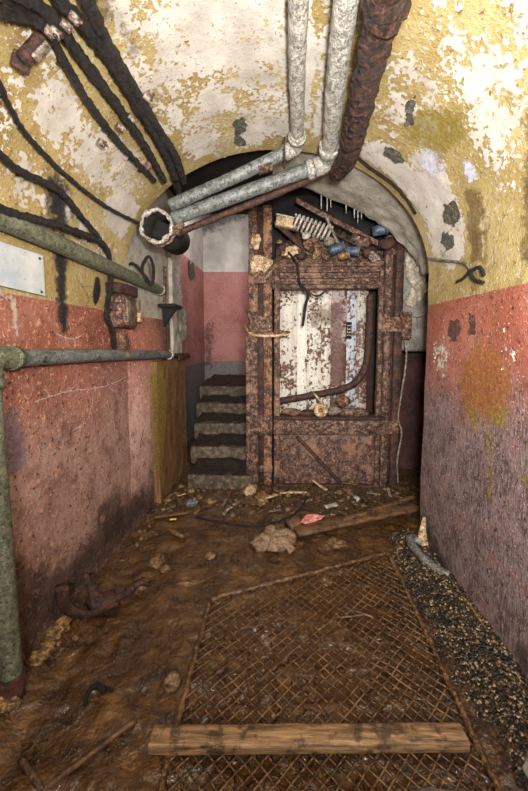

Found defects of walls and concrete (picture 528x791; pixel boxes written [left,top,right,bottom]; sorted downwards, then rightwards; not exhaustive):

peeling [0,45,147,258]
peeling [102,0,291,160]
peeling [360,0,528,273]
corrosion [330,303,344,384]
peeling [433,313,476,378]